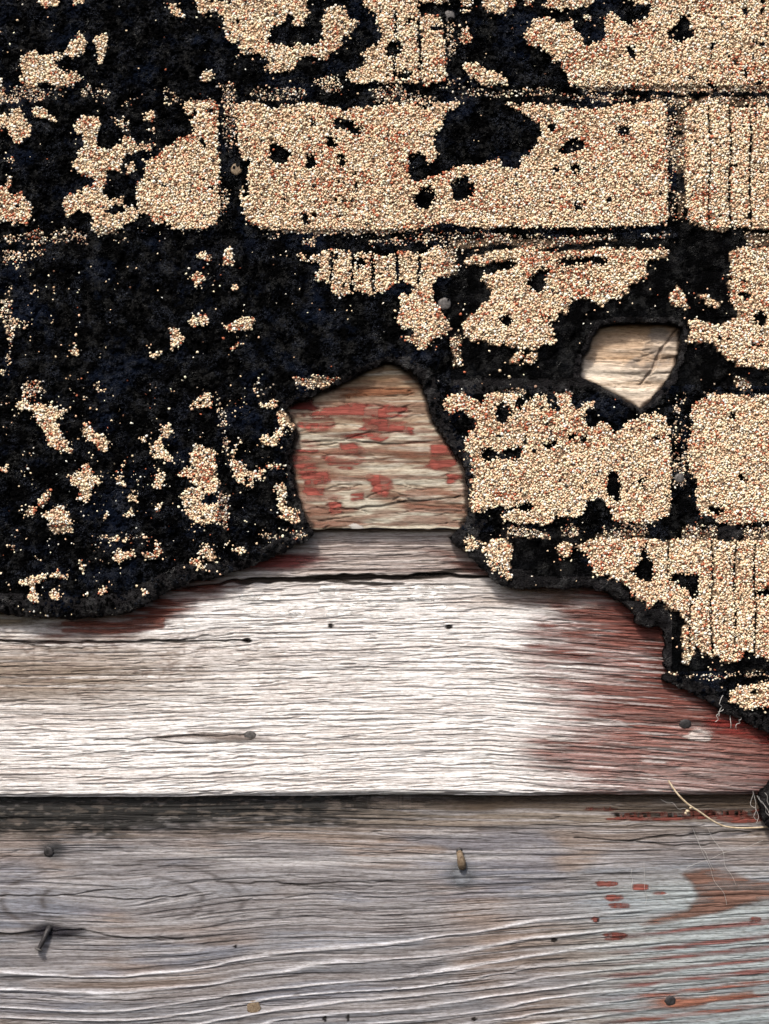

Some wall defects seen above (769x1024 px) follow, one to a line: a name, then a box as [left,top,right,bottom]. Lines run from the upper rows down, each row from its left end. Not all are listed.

peeling [0,0,769,619]
crack [217,568,489,586]
peeling [676,671,769,730]
peeling [683,730,711,741]